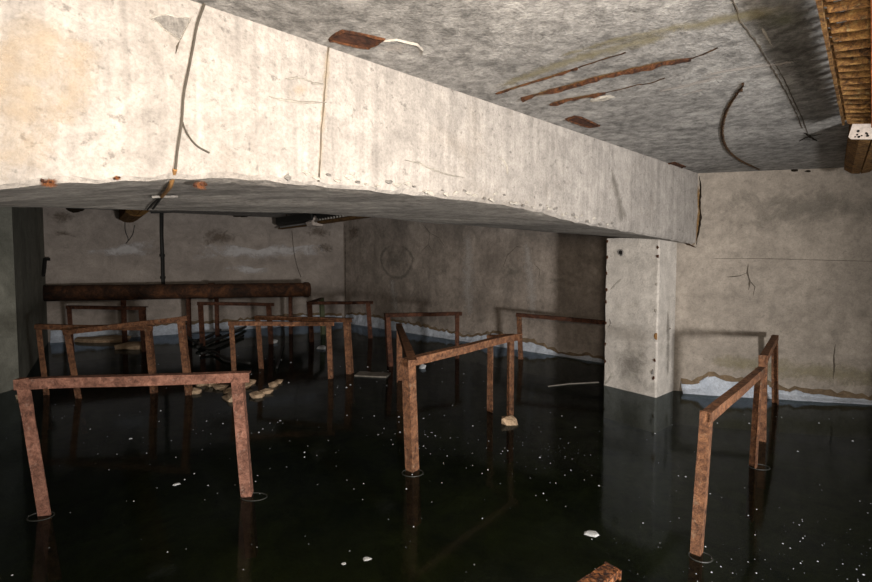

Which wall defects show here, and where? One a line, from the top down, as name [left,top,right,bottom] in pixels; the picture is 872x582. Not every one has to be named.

crack [318,47,330,182]
damp [153,282,605,363]
damp [681,372,743,396]
damp [767,380,872,405]